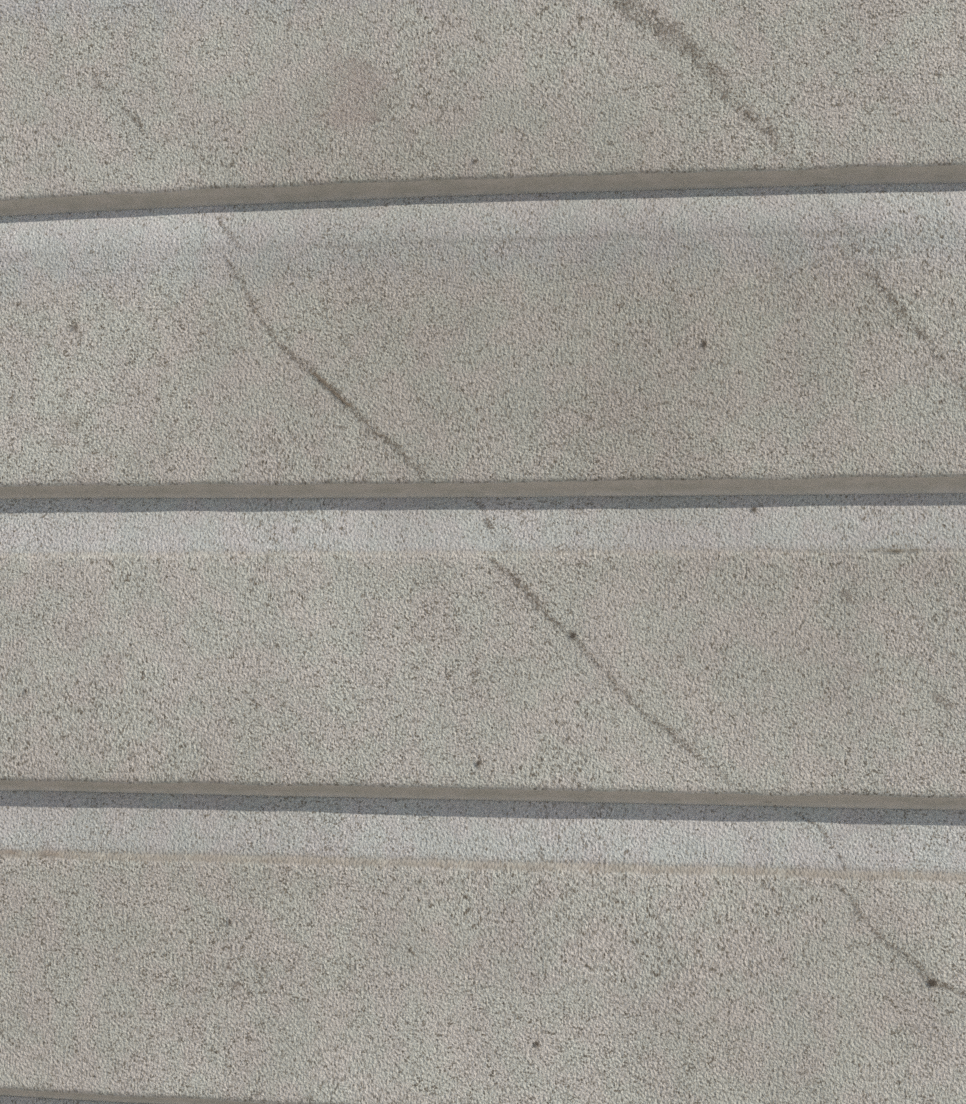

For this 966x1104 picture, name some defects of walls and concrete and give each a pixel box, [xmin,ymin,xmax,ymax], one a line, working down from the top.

crack [607,0,788,160]
crack [218,216,427,477]
crack [814,185,966,390]
crack [471,497,728,779]
crack [802,816,964,997]